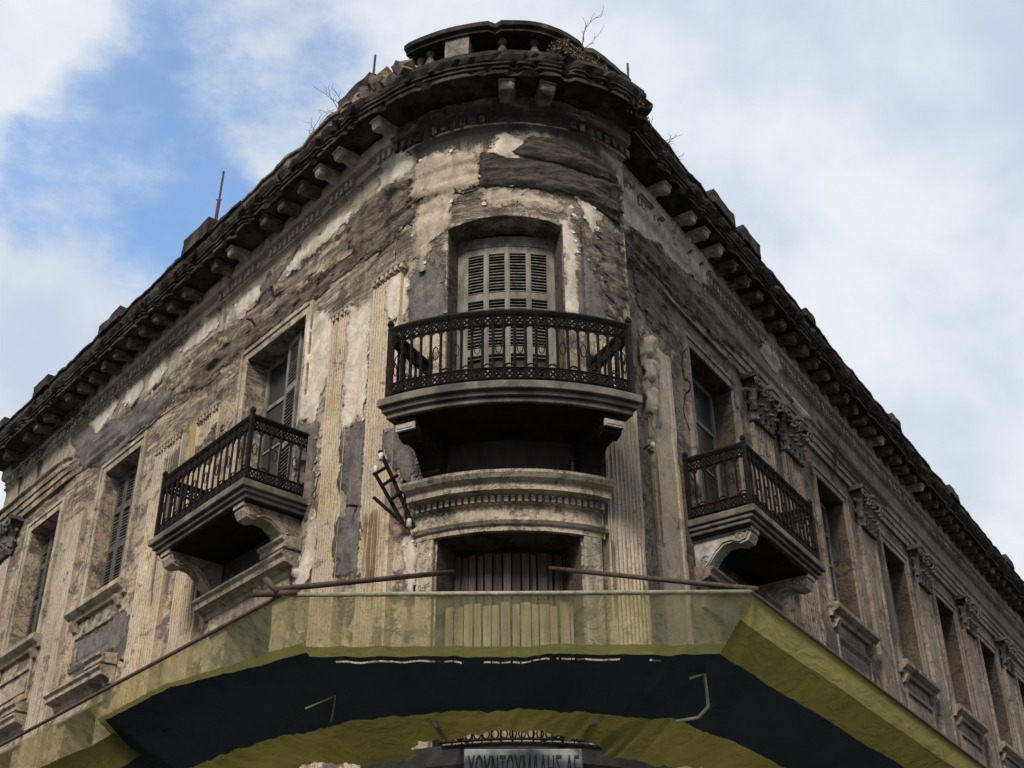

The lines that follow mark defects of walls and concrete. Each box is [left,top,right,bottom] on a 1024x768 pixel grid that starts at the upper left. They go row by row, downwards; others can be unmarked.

spalling [70,132,753,599]
crack [677,335,692,431]
corrosion [363,512,377,578]